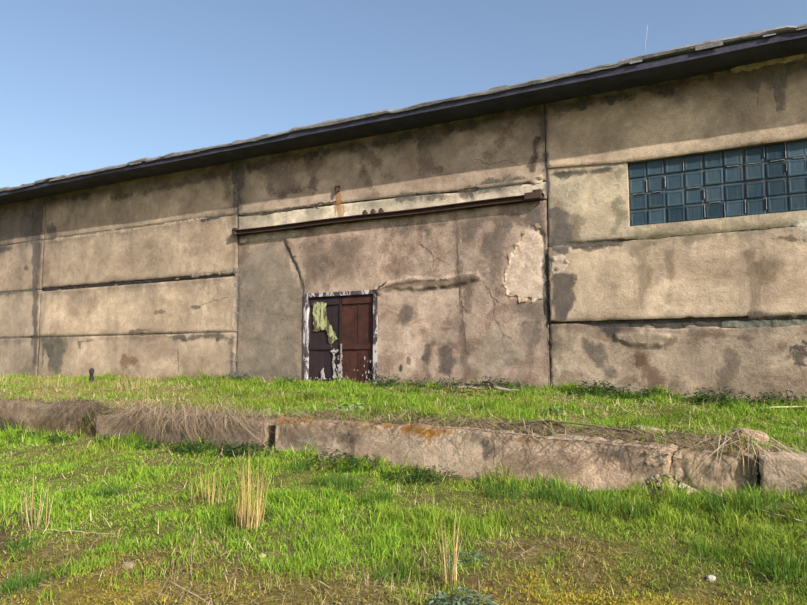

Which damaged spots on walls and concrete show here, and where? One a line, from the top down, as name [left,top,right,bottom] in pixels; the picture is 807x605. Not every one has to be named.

rust [335,186,344,217]
crack [285,239,303,289]
flaking render [503,223,568,303]
spalling [568,239,622,251]
damp [0,204,152,375]
damp [551,273,577,320]